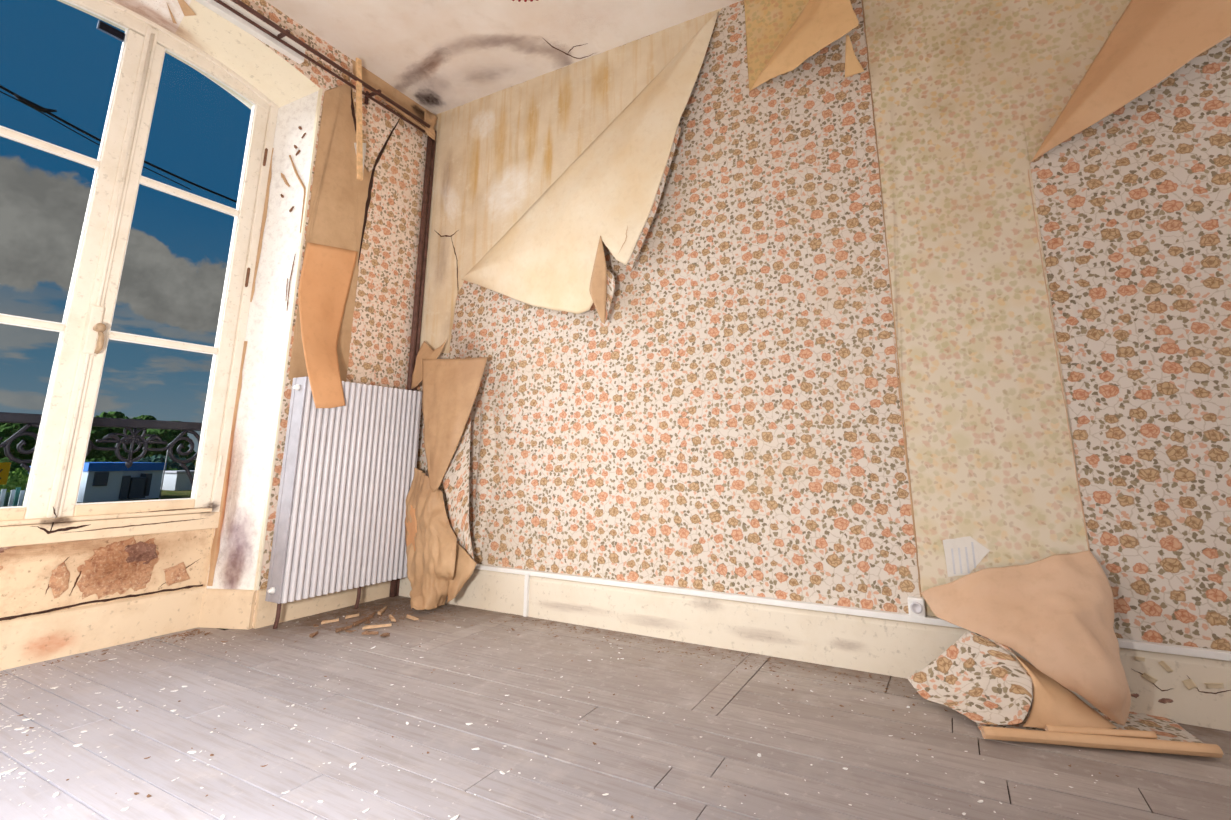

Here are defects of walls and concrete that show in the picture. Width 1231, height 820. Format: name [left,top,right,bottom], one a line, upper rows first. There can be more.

peeling [744,0,809,91]
leakage [413,94,438,114]
peeling [303,8,722,382]
peeling [288,301,308,379]
peeling [861,0,1131,616]
peeling [1132,656,1231,704]